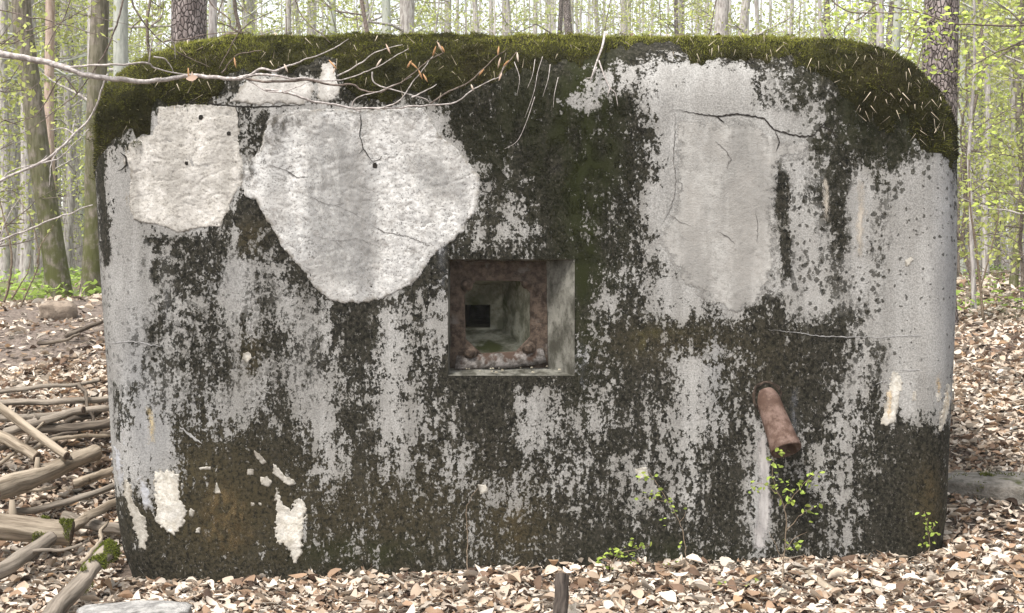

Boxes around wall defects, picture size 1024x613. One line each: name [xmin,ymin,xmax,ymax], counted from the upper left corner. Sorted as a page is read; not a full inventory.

spalling [123,62,480,304]
leakage [312,127,370,280]
crack [660,108,841,226]
efflorescence [881,371,917,426]
leakage [936,379,954,431]
leakage [109,414,201,550]
leakage [254,451,307,563]
leakage [754,432,772,548]